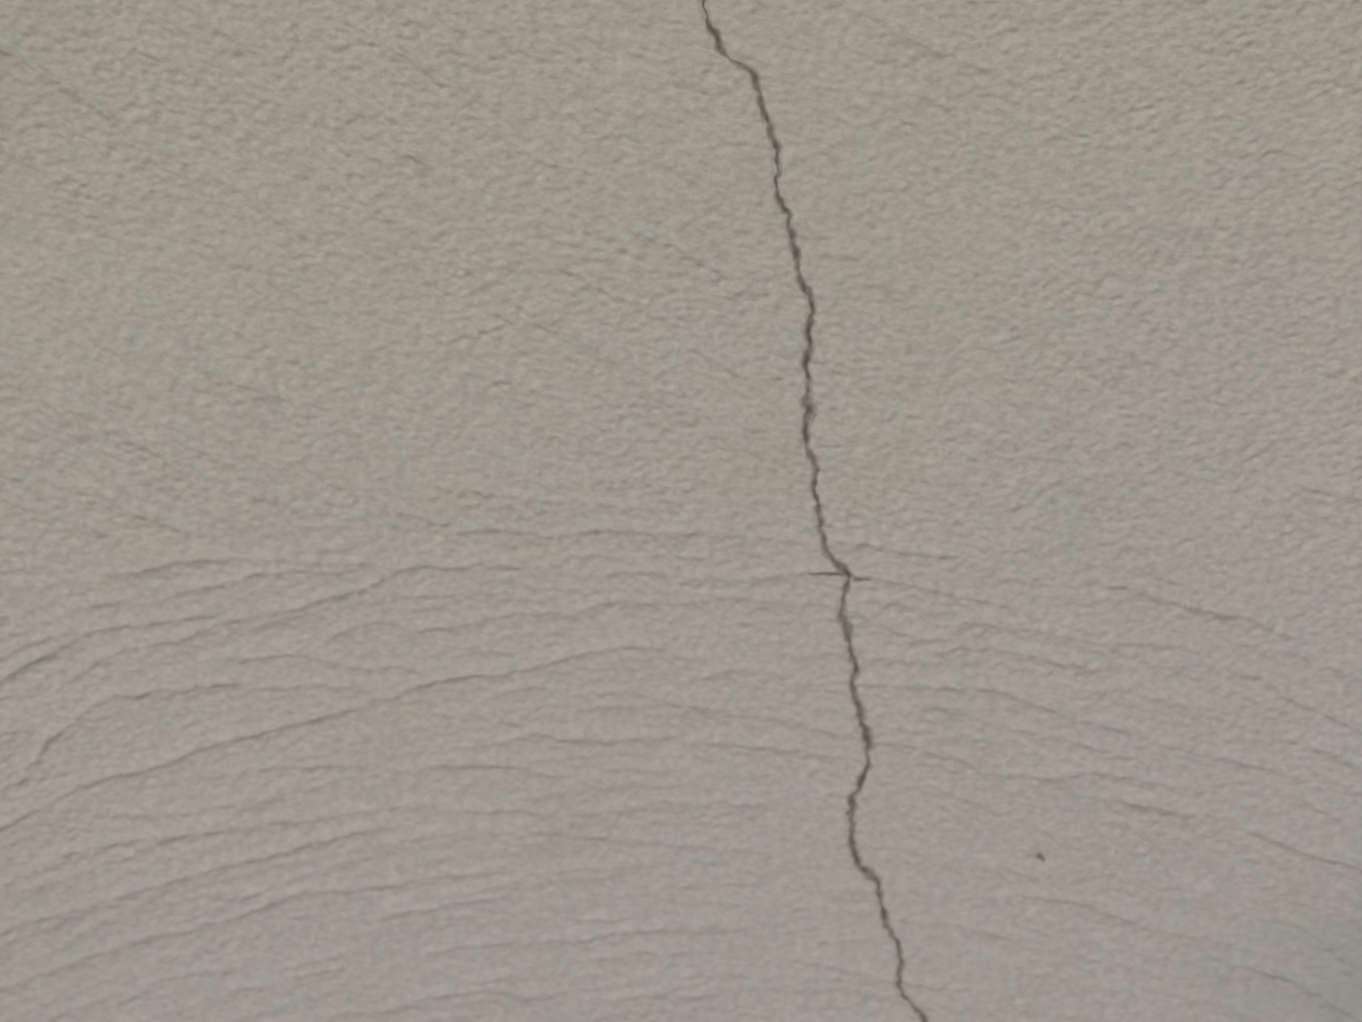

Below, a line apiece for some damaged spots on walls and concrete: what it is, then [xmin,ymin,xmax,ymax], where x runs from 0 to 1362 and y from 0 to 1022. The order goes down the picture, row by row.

crack [701,0,931,1022]